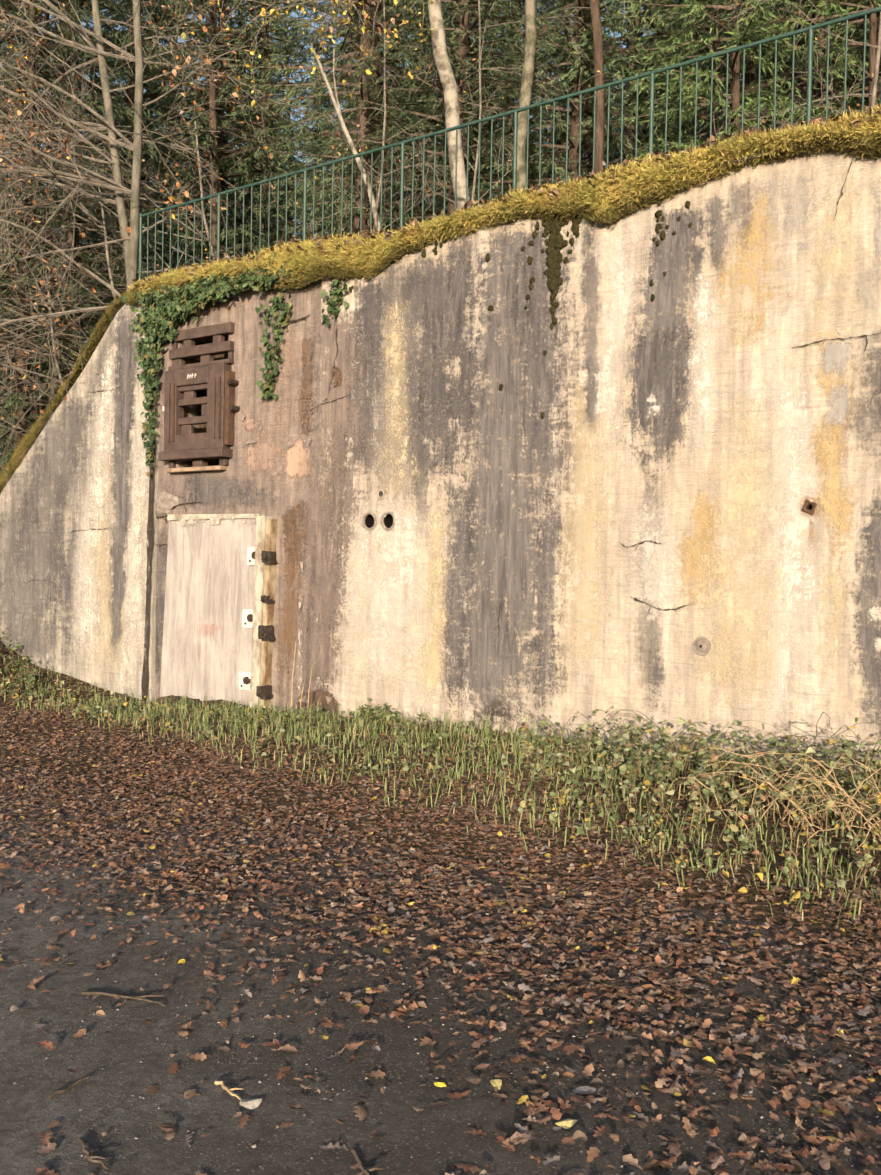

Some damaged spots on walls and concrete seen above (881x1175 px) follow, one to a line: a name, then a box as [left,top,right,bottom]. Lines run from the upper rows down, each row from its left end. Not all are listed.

damp [0,306,168,688]
spalling [241,338,313,478]
damp [297,176,881,738]
crack [792,333,880,352]